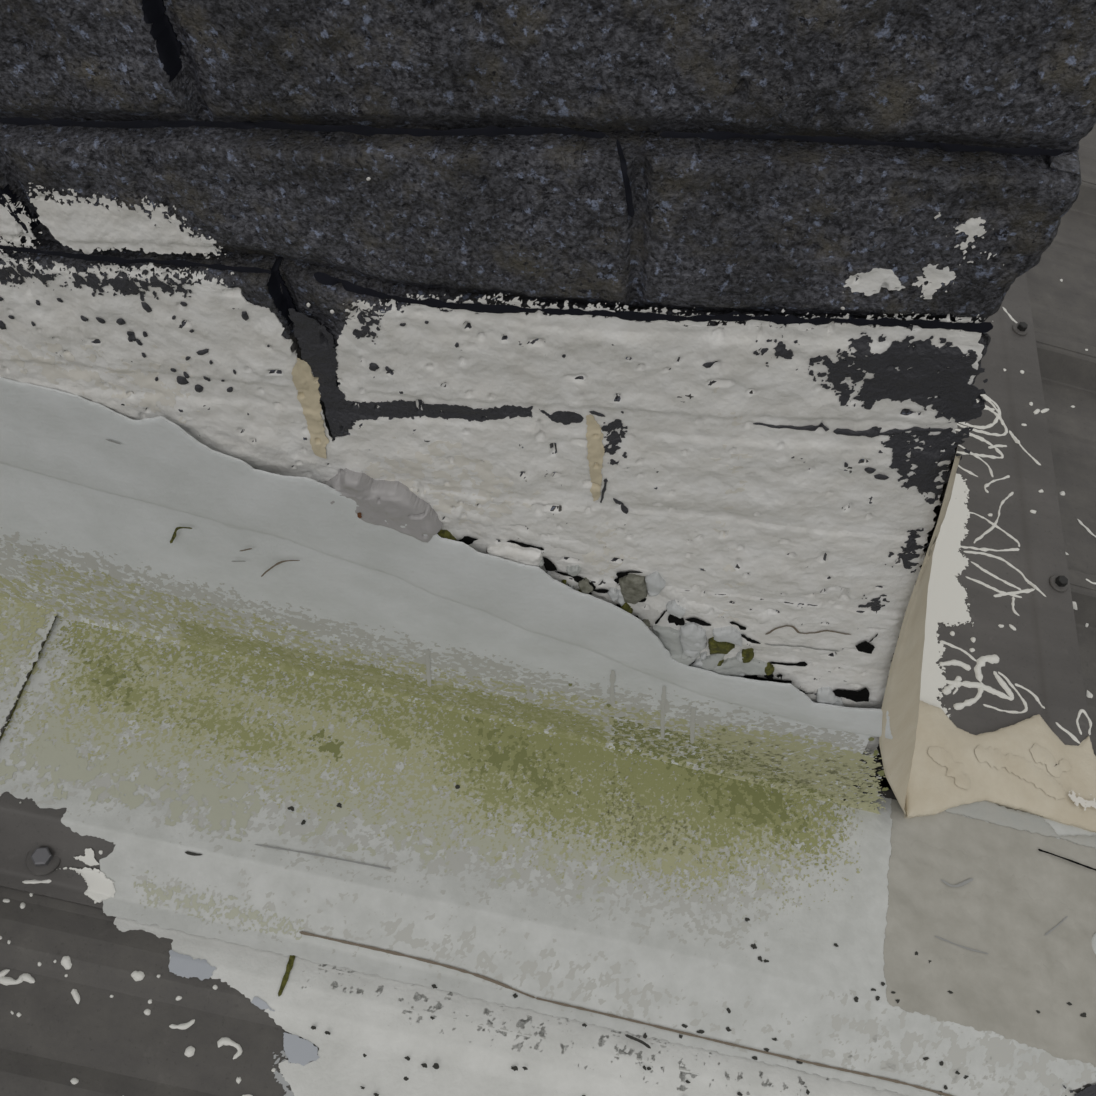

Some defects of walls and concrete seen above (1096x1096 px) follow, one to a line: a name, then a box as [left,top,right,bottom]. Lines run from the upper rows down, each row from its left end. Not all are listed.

peeling [0,258,192,320]
peeling [353,310,380,344]
peeling [753,335,798,366]
crack [320,400,333,437]
peeling [589,411,628,465]
peeling [808,324,988,509]
crack [170,527,192,543]
crack [231,548,300,577]
peeling [885,528,931,573]
crack [507,540,878,702]
leakage [0,521,886,1096]
leakage [761,990,1096,1096]